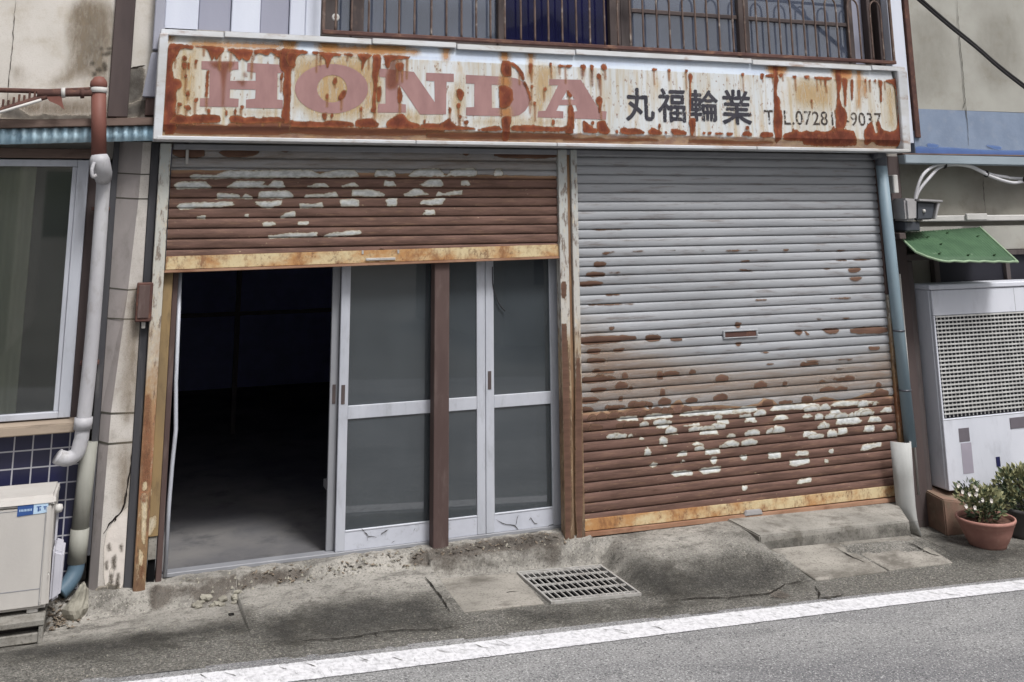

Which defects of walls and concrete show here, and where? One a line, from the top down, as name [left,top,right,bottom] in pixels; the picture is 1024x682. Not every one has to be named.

rust [163,36,901,257]
rust [825,250,870,281]
rust [817,318,888,350]
crack [103,454,132,534]
rust [141,395,152,502]
rust [562,324,897,540]